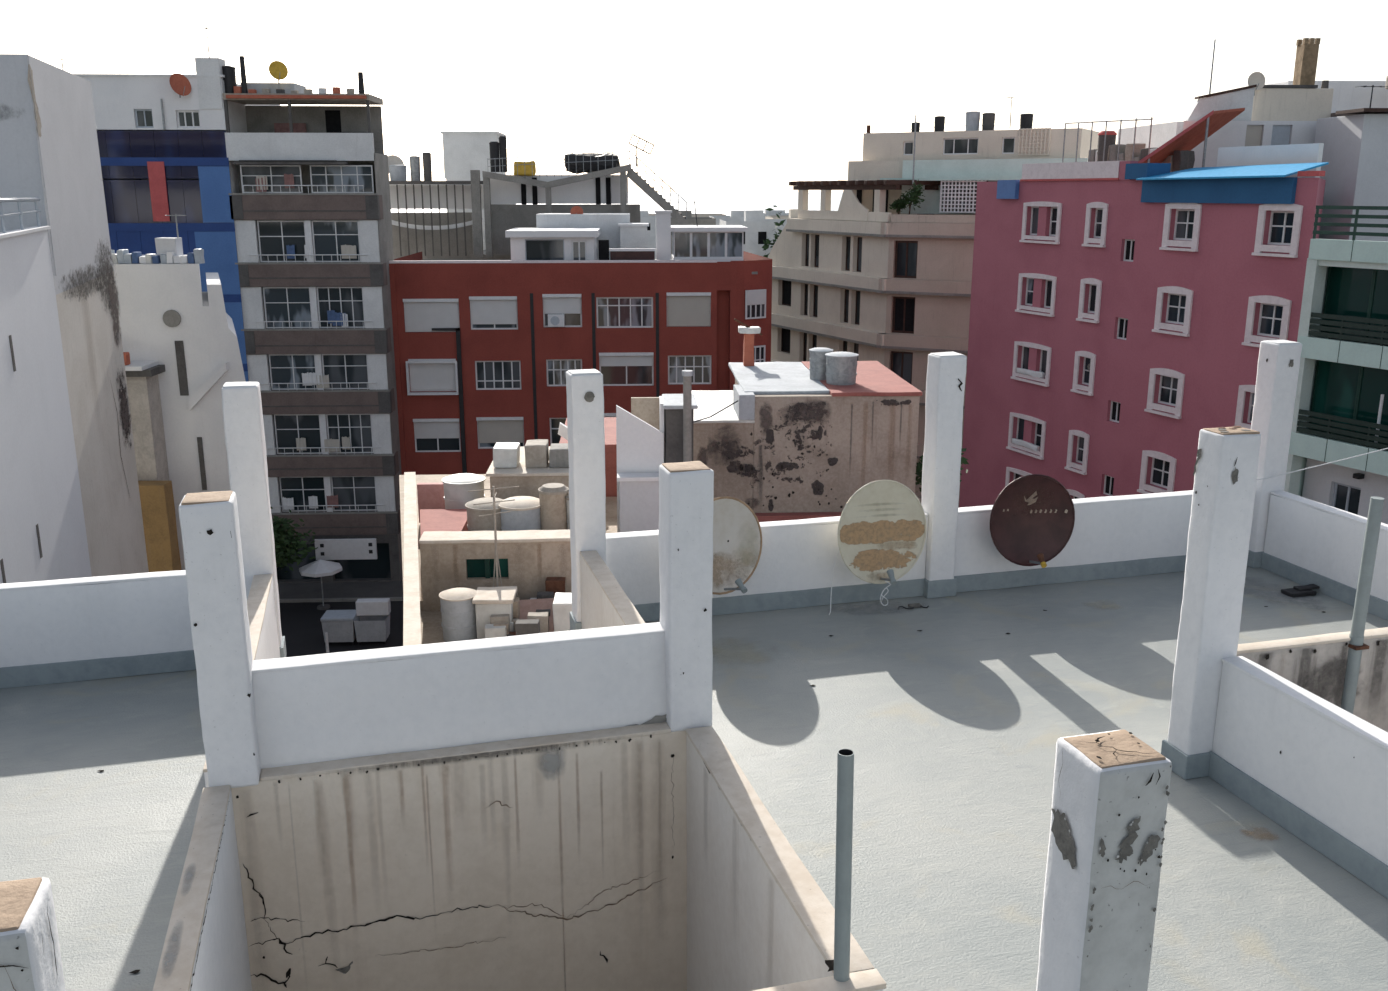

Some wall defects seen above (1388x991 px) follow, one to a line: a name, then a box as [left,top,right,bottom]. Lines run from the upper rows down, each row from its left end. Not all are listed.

water stain [63,244,121,344]
water stain [1298,646,1357,706]
water stain [1372,640,1388,686]
water stain [421,745,560,773]
crack [190,757,719,991]
peeling [1051,808,1076,869]
peeling [1099,814,1167,875]